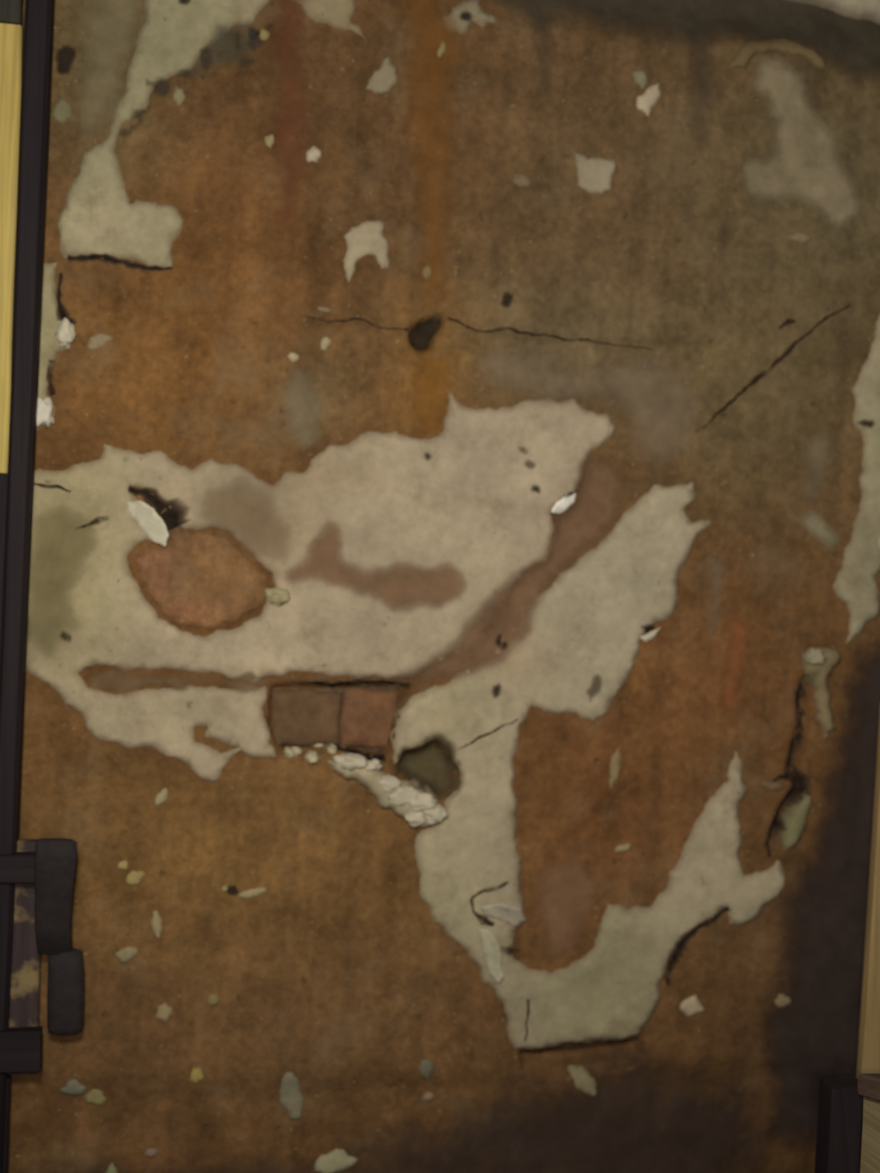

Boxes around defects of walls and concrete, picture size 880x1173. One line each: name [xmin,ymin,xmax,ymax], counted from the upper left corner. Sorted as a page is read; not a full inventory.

peeling [292,0,365,38]
peeling [575,153,616,194]
peeling [36,0,270,431]
peeling [343,221,390,283]
crack [47,359,55,396]
crack [56,253,173,325]
crack [307,316,408,331]
crack [447,317,653,350]
crack [704,304,851,427]
peeling [801,315,880,740]
peeling [26,390,813,1050]
crack [766,683,811,857]